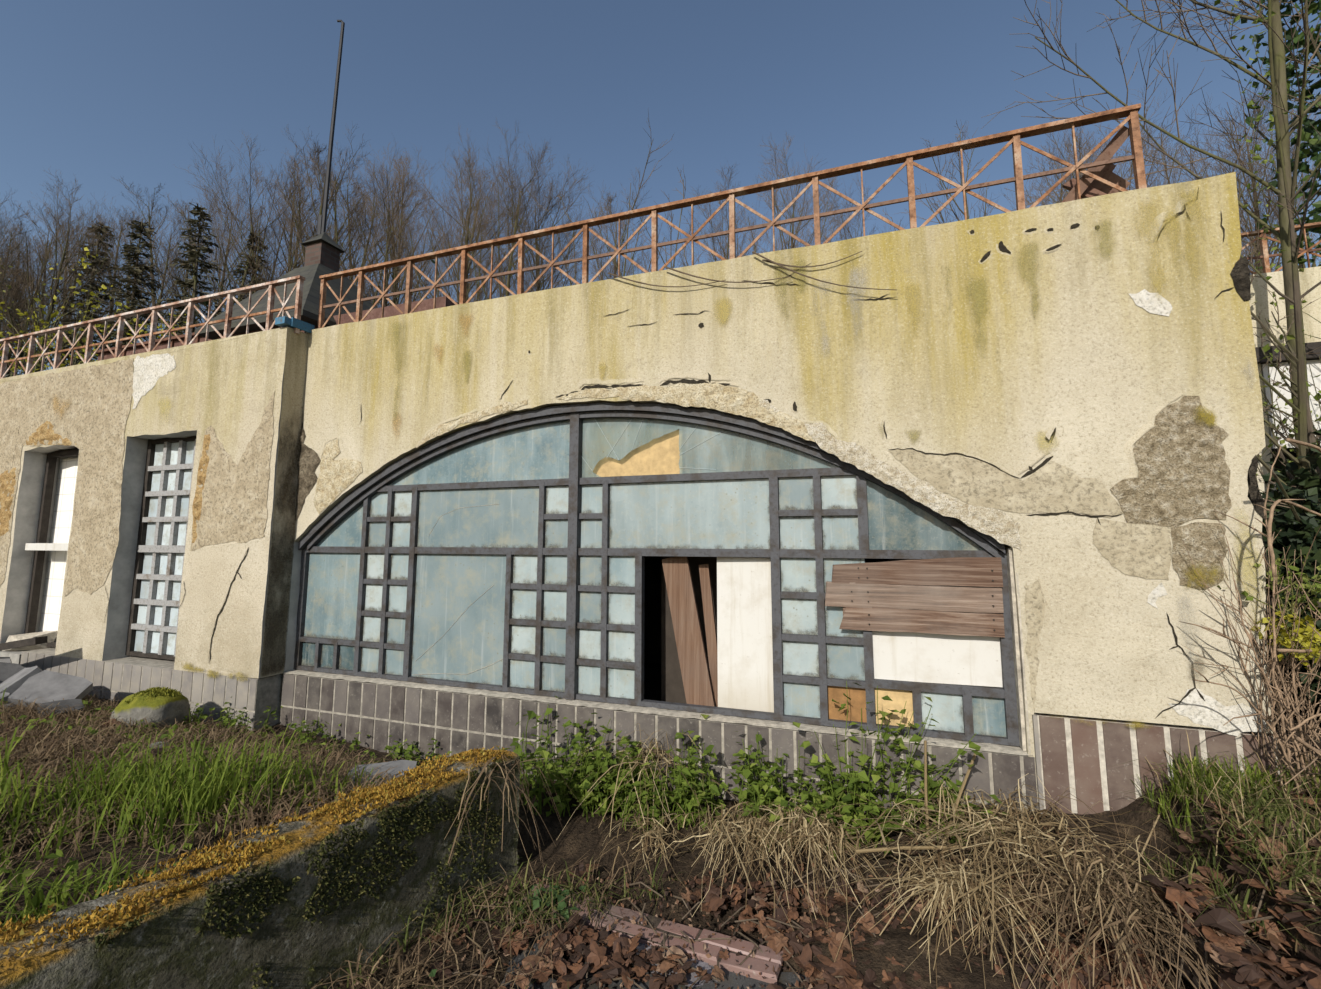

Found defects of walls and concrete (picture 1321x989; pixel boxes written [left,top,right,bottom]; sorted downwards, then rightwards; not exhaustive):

flaking render [0,353,176,597]
flaking render [190,391,275,554]
flaking render [556,380,1022,551]
crack [874,421,1053,479]
flaking render [1045,424,1056,443]
crack [1029,510,1121,525]
flaking render [1093,393,1232,609]
spalling [1248,455,1265,520]